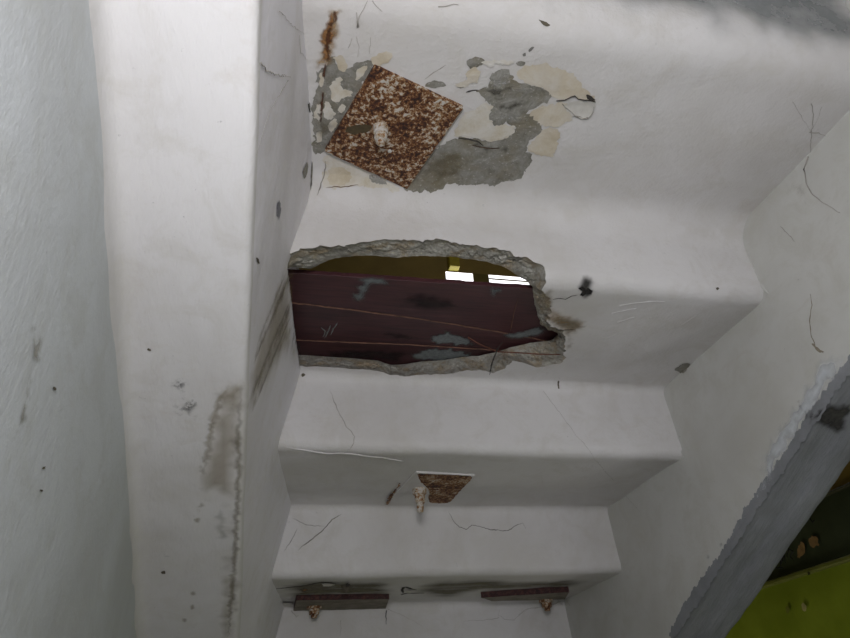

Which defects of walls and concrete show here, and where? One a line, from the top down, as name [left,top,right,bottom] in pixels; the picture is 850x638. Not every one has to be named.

rust [318,12,337,77]
peeling [303,47,596,195]
spalling [288,238,579,377]
crack [285,515,340,550]
crack [449,513,526,531]